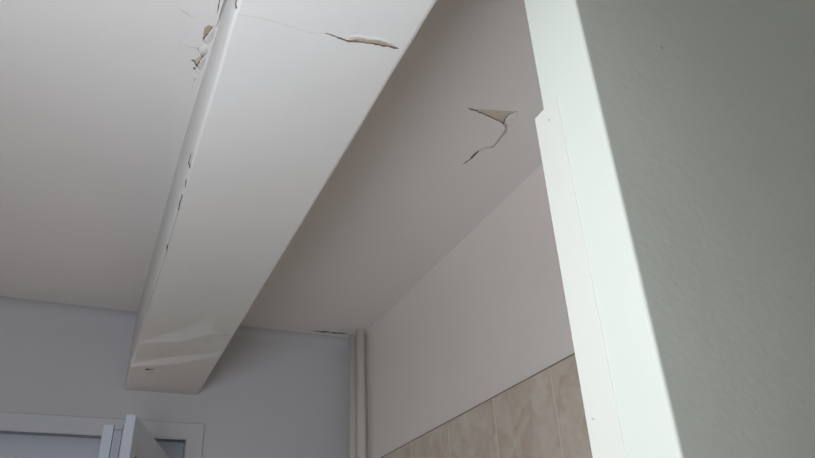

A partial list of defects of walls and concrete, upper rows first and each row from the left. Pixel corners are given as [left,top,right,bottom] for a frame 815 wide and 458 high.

crack [235,0,399,49]